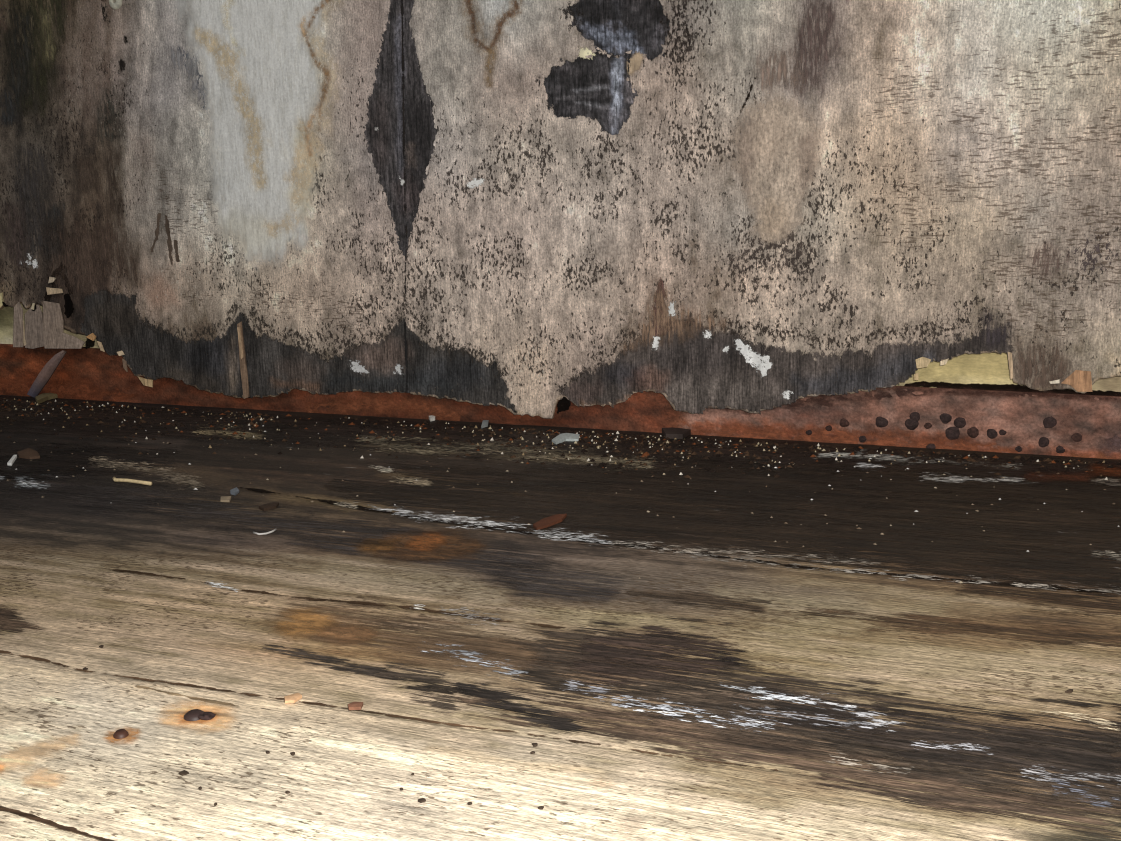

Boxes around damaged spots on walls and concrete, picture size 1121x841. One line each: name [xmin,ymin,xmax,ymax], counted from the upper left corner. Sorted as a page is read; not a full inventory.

damp [168,0,340,260]
peeling [364,0,438,302]
peeling [532,0,699,152]
damp [3,90,517,413]
peeling [97,341,153,387]
damp [558,279,1068,414]
corrosion [683,412,1022,453]
corrosion [773,387,1118,409]
peeling [1049,370,1092,392]
corrosion [1025,416,1121,481]
damp [0,395,1121,841]
corrosion [164,703,231,730]